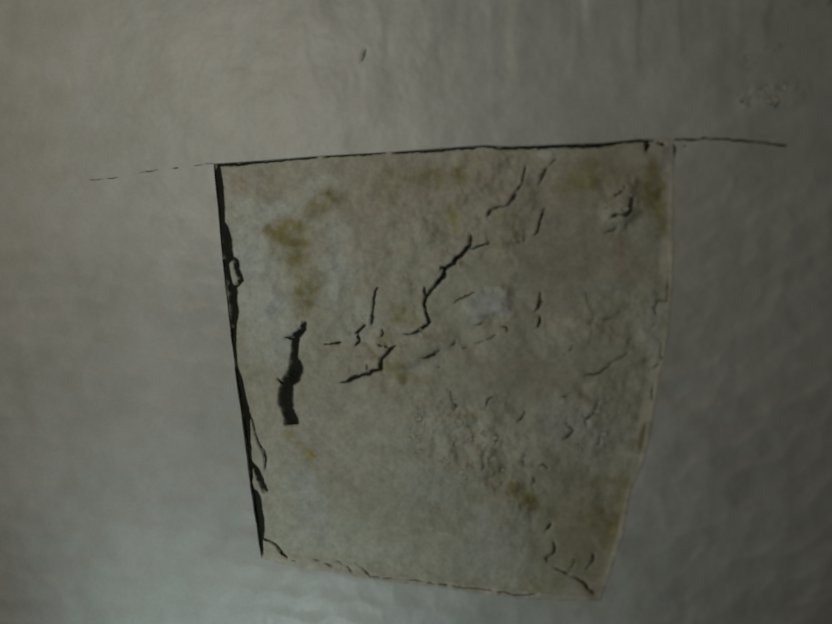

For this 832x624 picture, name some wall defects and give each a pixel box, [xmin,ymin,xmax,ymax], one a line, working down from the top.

damp [368,161,472,237]
damp [635,147,674,242]
damp [259,181,343,331]
flaking render [214,139,675,601]
crack [211,137,787,558]
crack [545,523,594,593]
damp [559,469,632,554]